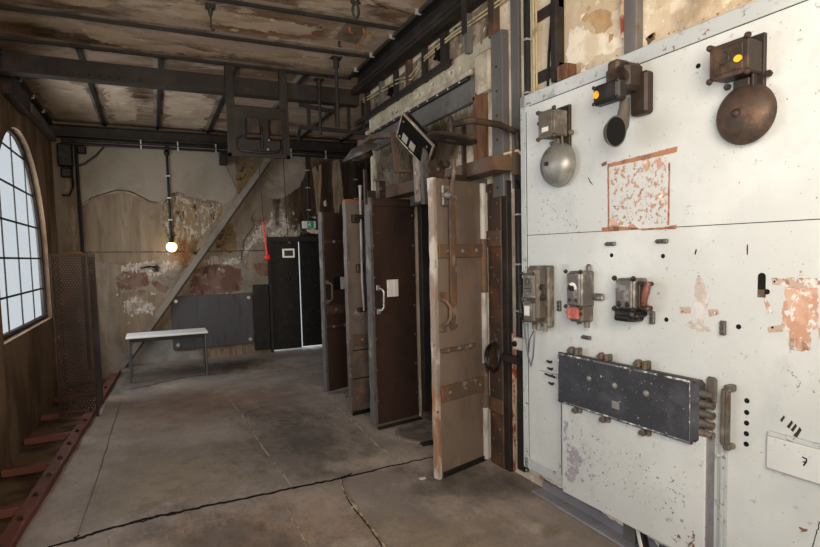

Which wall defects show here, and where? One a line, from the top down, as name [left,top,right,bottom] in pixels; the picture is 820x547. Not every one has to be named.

damp [0,22,118,46]
damp [213,22,319,39]
peeling [565,6,635,74]
flaking render [116,192,318,324]
crack [48,371,433,547]